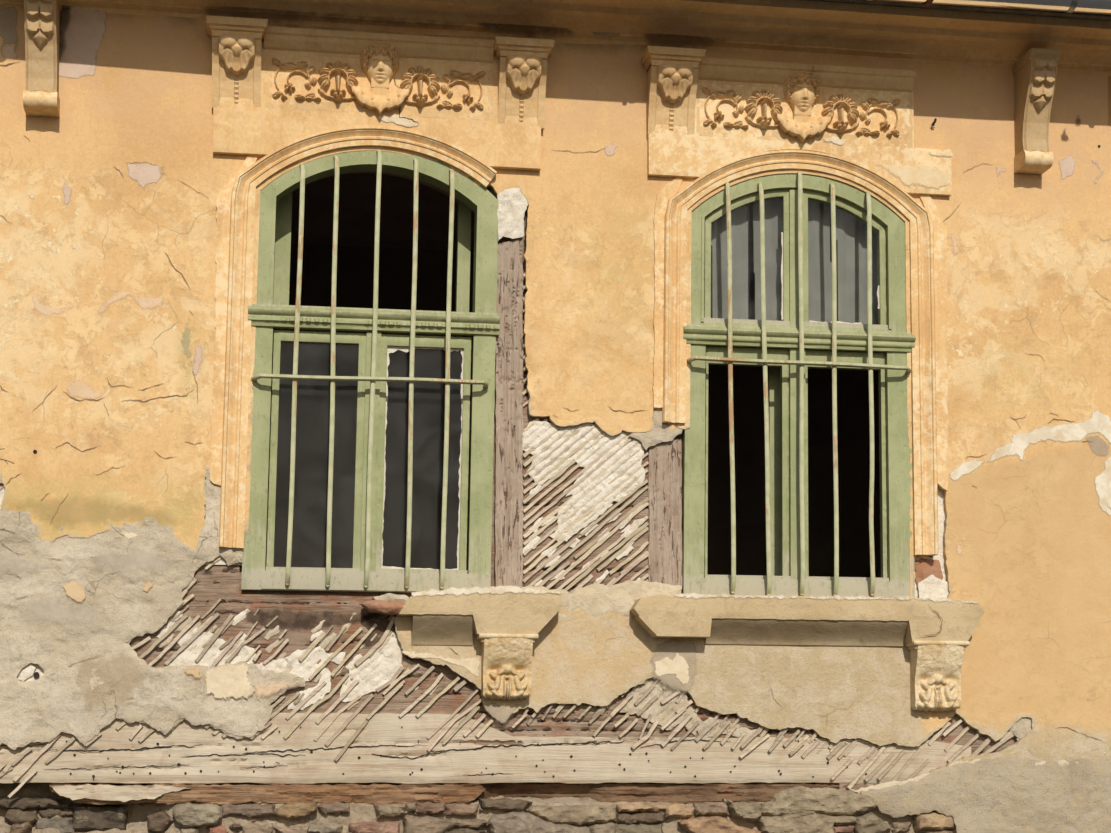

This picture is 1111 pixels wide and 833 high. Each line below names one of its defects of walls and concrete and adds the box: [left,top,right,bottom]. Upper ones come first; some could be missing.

peeling [0,5,18,59]
peeling [59,7,106,78]
peeling [128,163,163,188]
spalling [497,187,528,241]
crack [36,371,198,415]
spalling [521,272,683,621]
flaking render [0,466,1031,798]